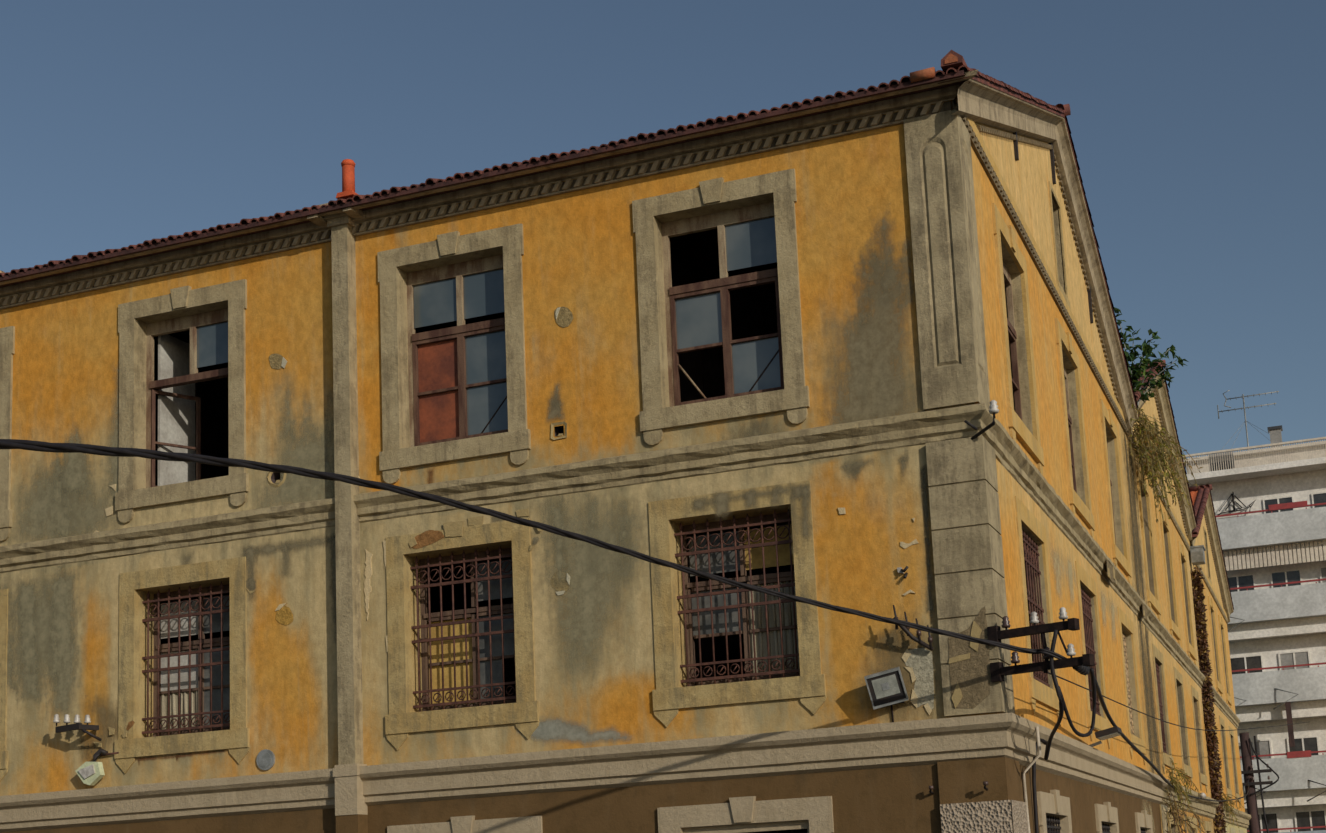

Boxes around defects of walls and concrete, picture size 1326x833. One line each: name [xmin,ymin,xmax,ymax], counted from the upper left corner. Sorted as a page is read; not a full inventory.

damp [832,219,916,425]
damp [18,369,119,539]
damp [7,576,75,712]
damp [543,501,637,669]
spalling [902,607,990,715]